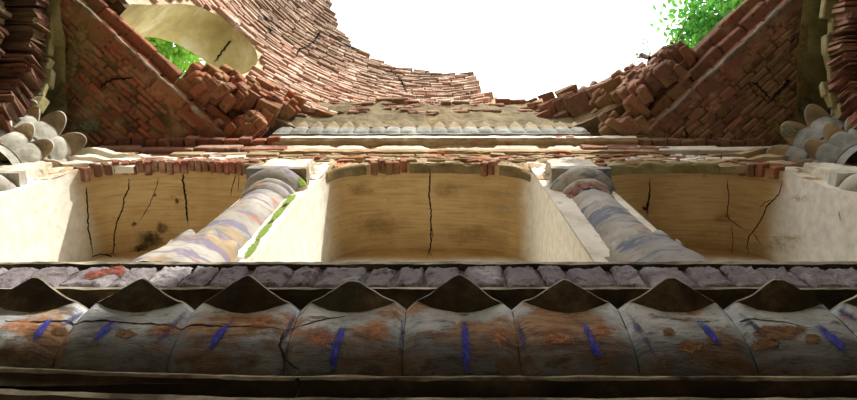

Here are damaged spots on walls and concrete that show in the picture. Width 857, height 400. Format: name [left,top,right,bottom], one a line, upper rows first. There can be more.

crack [751,79,790,101]
crack [86,181,158,258]
leakage [135,223,167,252]
crack [180,174,188,223]
crack [426,170,434,259]
crack [643,181,651,220]
crack [727,181,783,254]
crack [740,318,800,326]
crack [5,316,345,398]